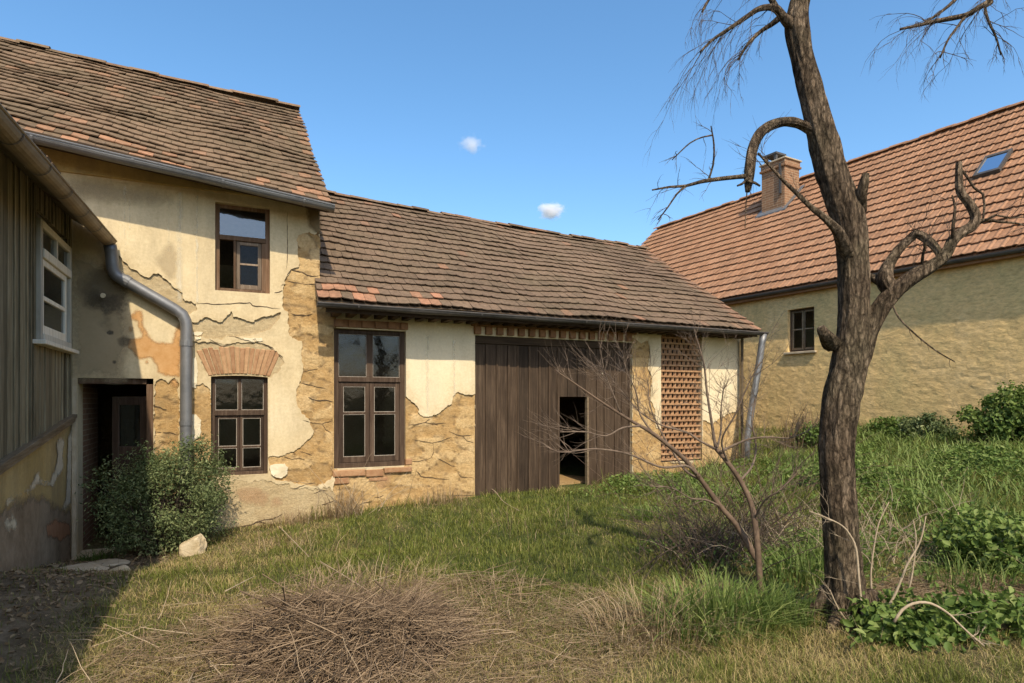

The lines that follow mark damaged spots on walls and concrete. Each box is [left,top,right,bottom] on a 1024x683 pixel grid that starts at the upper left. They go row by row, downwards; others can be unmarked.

peeling [27,438,64,492]
spalling [47,520,70,541]
spalling [119,232,475,537]
spalling [631,338,739,476]